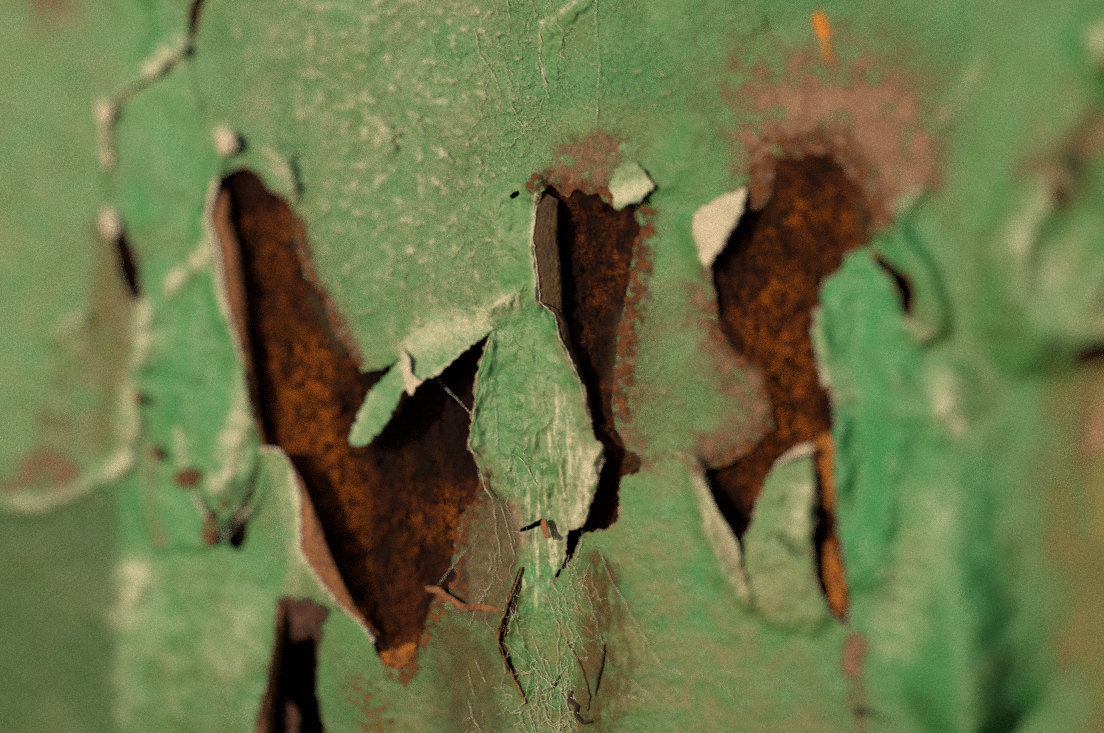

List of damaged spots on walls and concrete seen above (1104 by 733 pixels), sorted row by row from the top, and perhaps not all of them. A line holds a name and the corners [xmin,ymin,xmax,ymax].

crack [186,0,206,39]
corrosion [542,133,622,207]
corrosion [725,14,944,222]
peeling [0,0,658,733]
corrosion [613,224,653,471]
corrosion [684,268,772,473]
peeling [693,123,922,629]